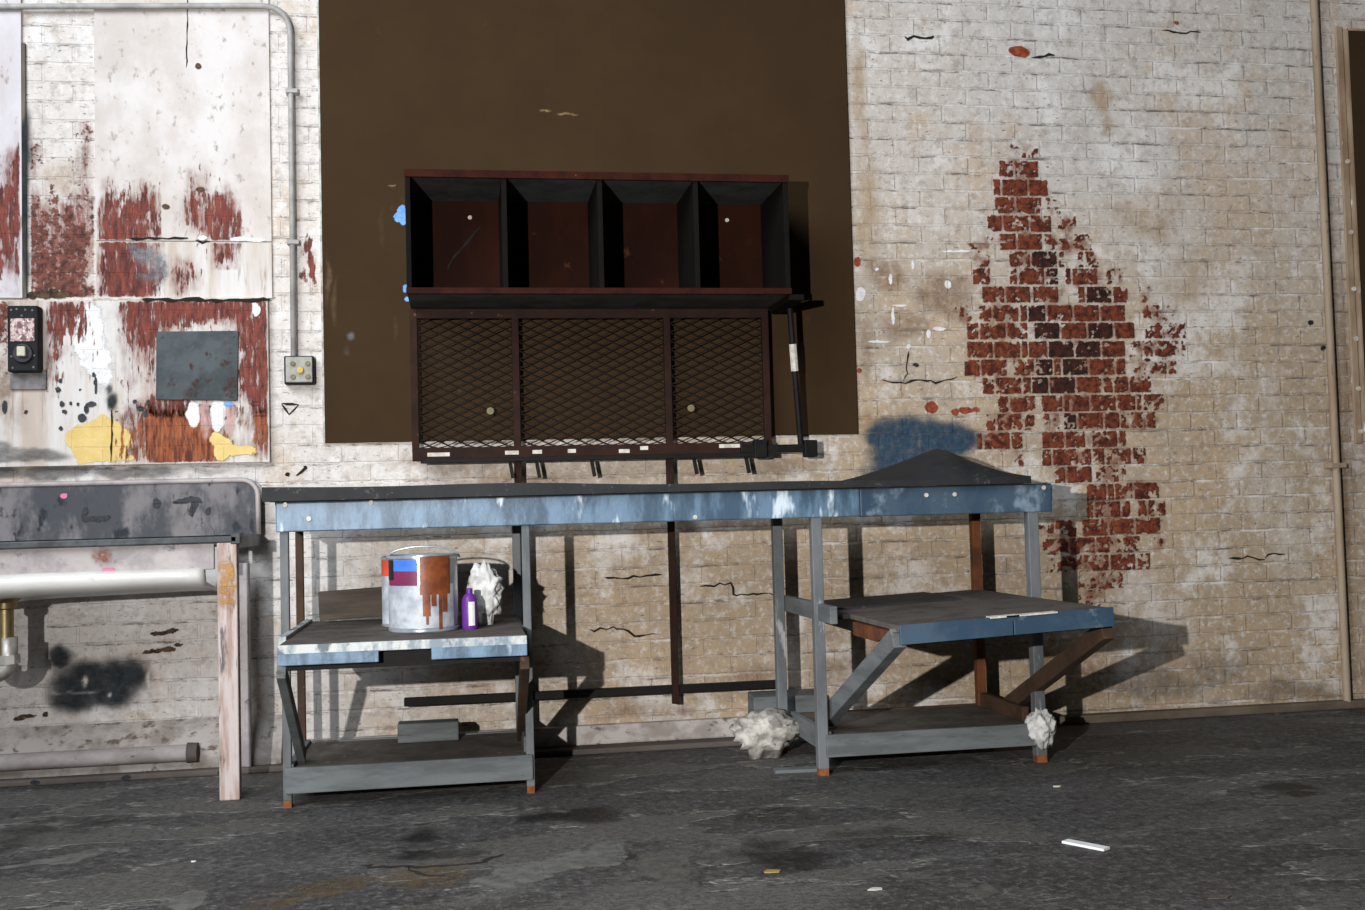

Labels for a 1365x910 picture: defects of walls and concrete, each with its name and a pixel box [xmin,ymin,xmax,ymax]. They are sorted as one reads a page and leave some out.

spalling [27,289,71,300]
peeling [856,287,866,301]
peeling [925,144,1186,606]